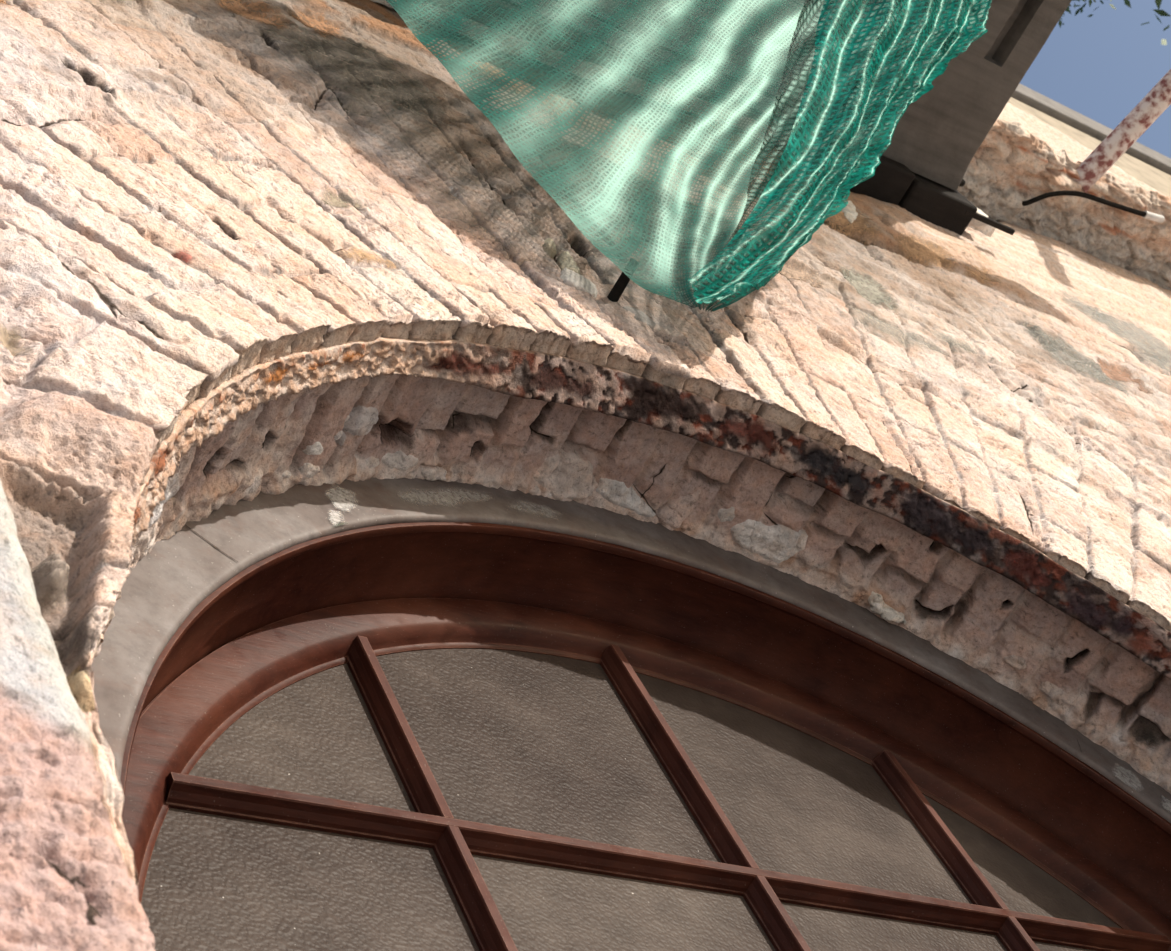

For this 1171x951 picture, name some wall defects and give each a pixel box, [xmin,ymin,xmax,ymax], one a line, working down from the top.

crack [314,76,364,116]
corrosion [427,351,506,376]
corrosion [530,368,596,396]
corrosion [621,378,703,419]
corrosion [719,420,777,451]
corrosion [805,449,872,494]
corrosion [901,491,993,556]